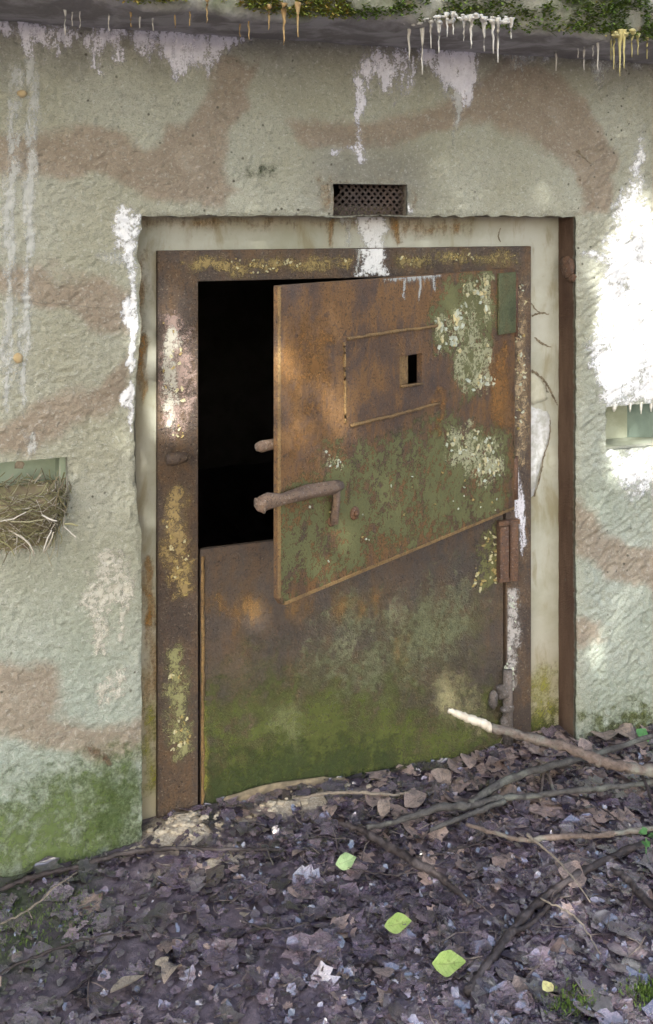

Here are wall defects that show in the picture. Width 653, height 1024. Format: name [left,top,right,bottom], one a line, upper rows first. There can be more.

leakage [267,2,301,45]
leakage [331,11,515,164]
leakage [577,28,649,80]
leakage [0,0,250,432]
peeling [280,249,551,690]